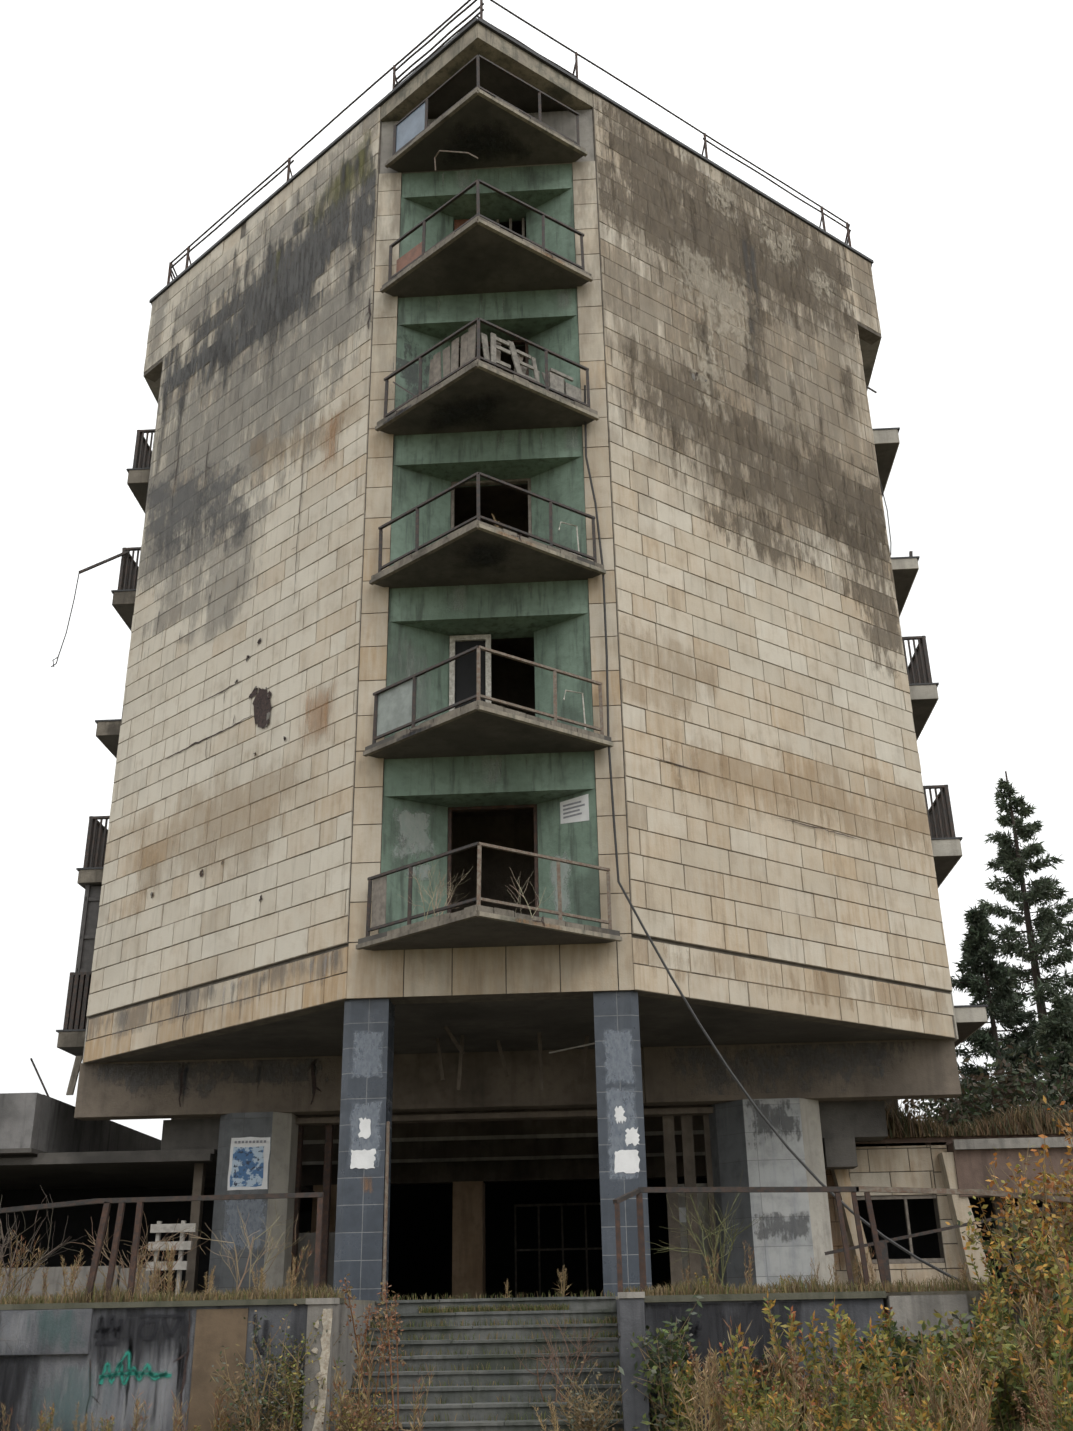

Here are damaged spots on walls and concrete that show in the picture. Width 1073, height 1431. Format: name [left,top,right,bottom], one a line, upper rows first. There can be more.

water stain [157,141,376,447]
water stain [596,103,903,676]
water stain [144,464,252,610]
crack [165,681,252,759]
hole [249,686,271,729]